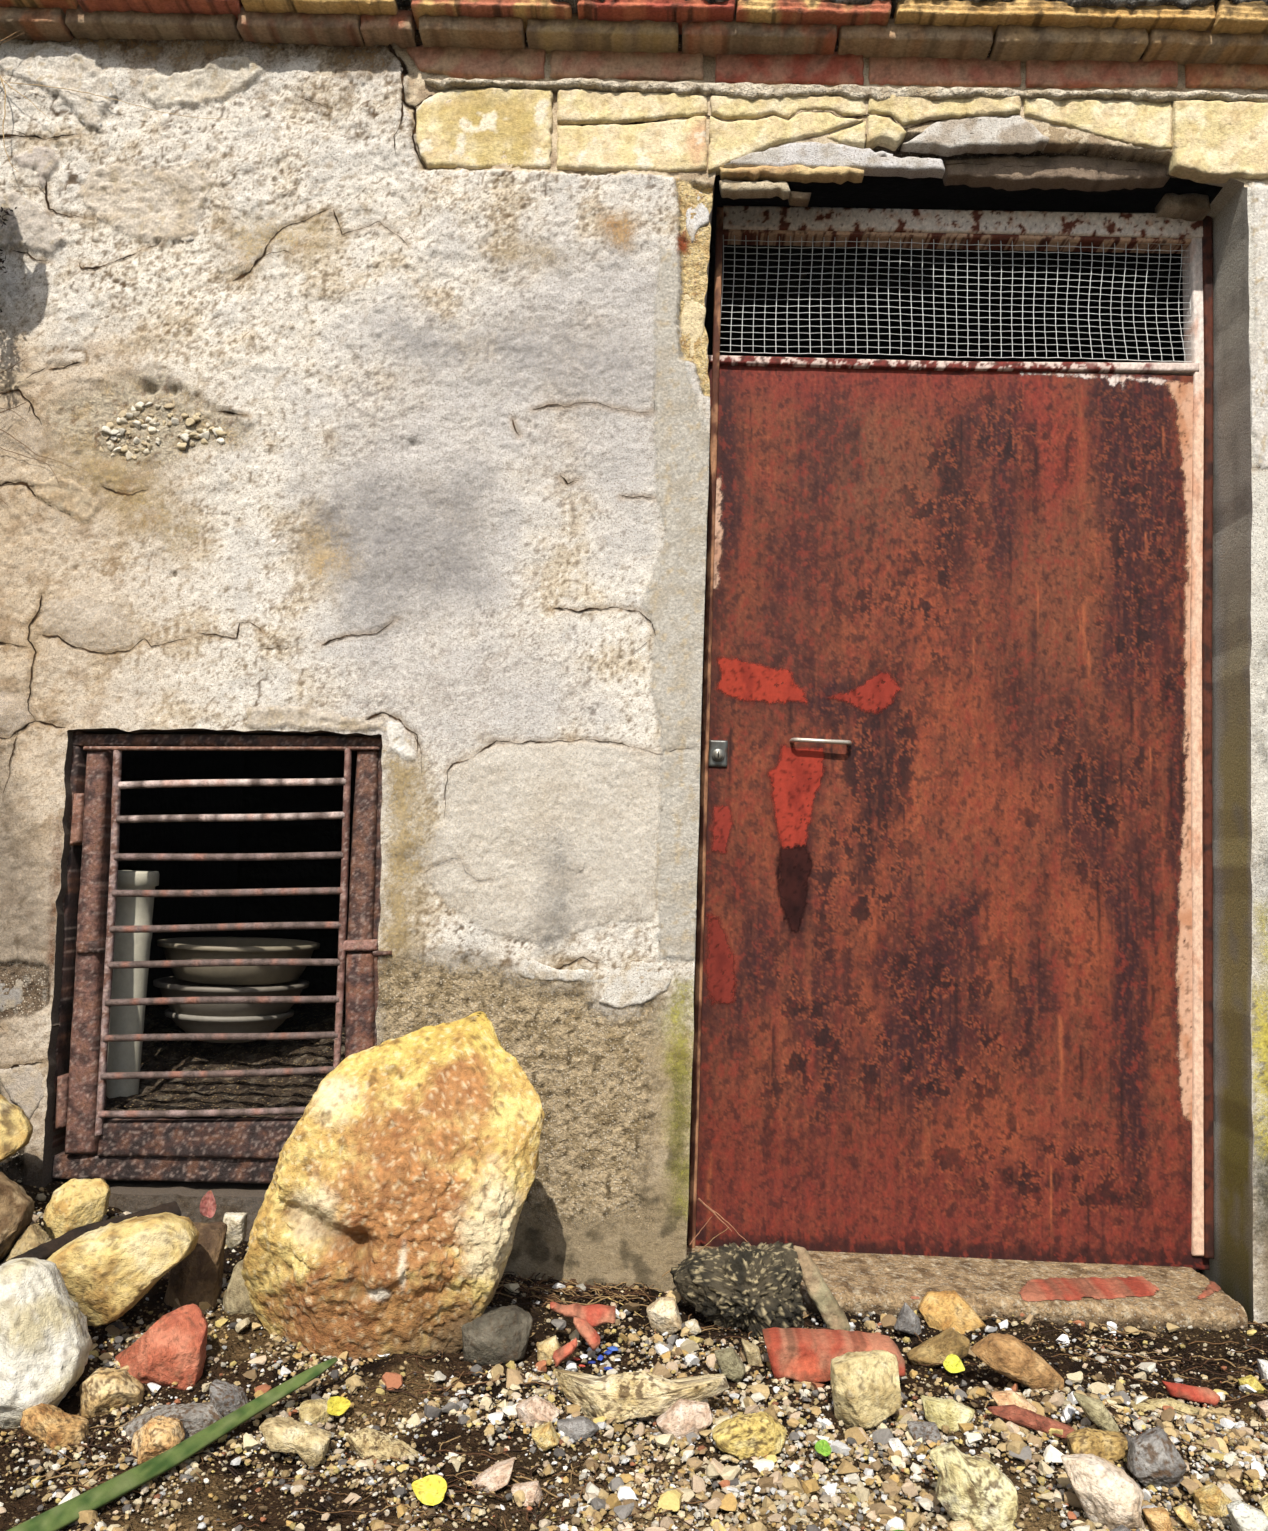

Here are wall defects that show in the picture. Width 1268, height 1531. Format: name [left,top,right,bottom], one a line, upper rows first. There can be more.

crack [10,178,79,217]
crack [14,245,156,270]
crack [233,208,406,281]
crack [0,362,80,425]
crack [512,387,655,435]
crack [0,481,71,515]
crack [102,486,148,495]
crack [553,606,656,664]
crack [0,593,395,800]
spalling [376,115,1211,1224]
corrosion [776,843,813,932]